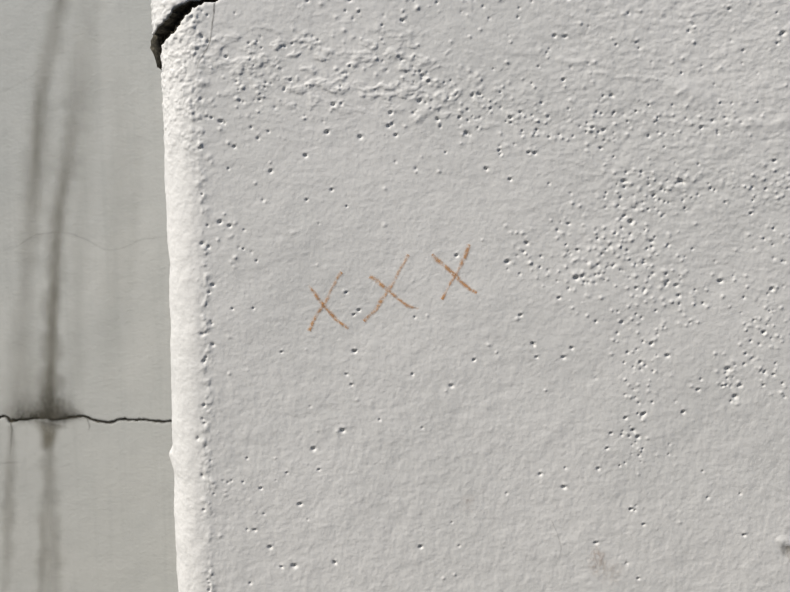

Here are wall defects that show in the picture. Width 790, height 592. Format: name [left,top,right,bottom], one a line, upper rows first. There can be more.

crack [150,0,217,70]
crack [0,415,172,424]